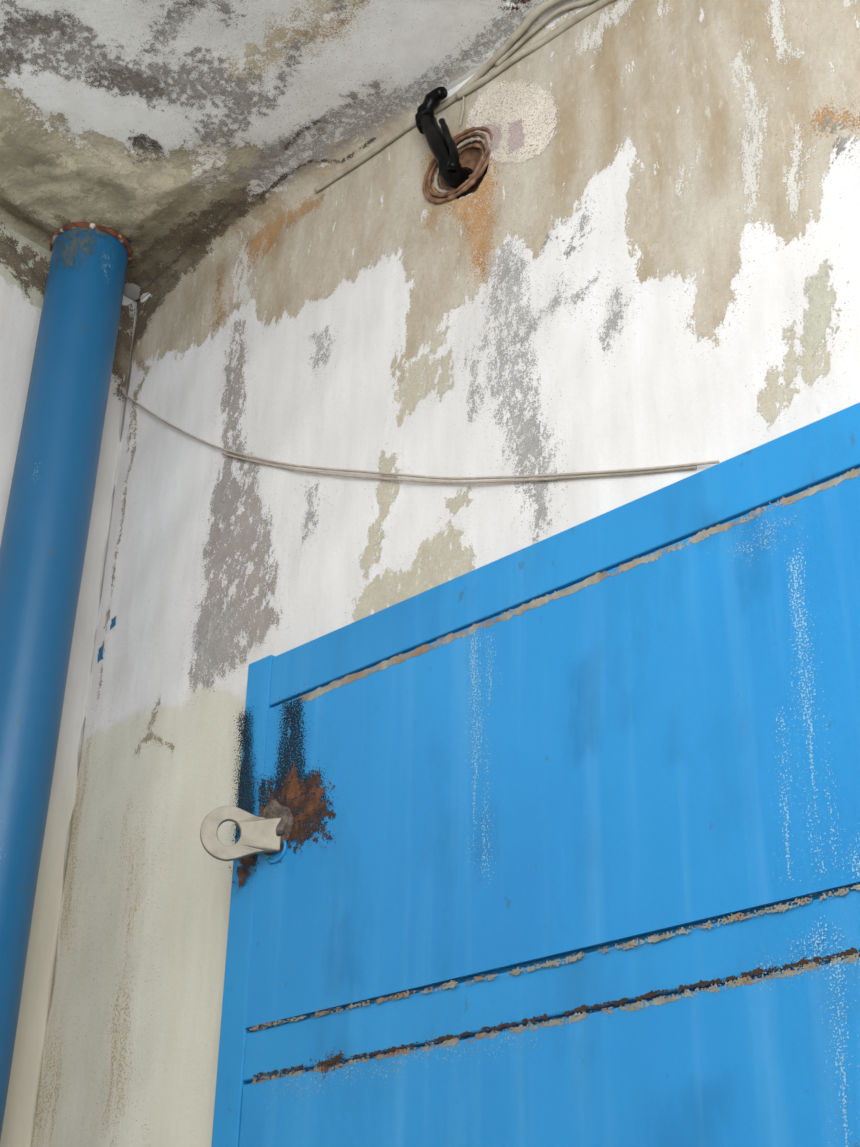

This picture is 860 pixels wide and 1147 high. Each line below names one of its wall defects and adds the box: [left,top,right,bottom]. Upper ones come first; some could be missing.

damp [0,0,541,191]
rust [791,81,860,163]
rust [414,147,510,296]
peeling [132,0,860,431]
peeling [351,450,477,623]